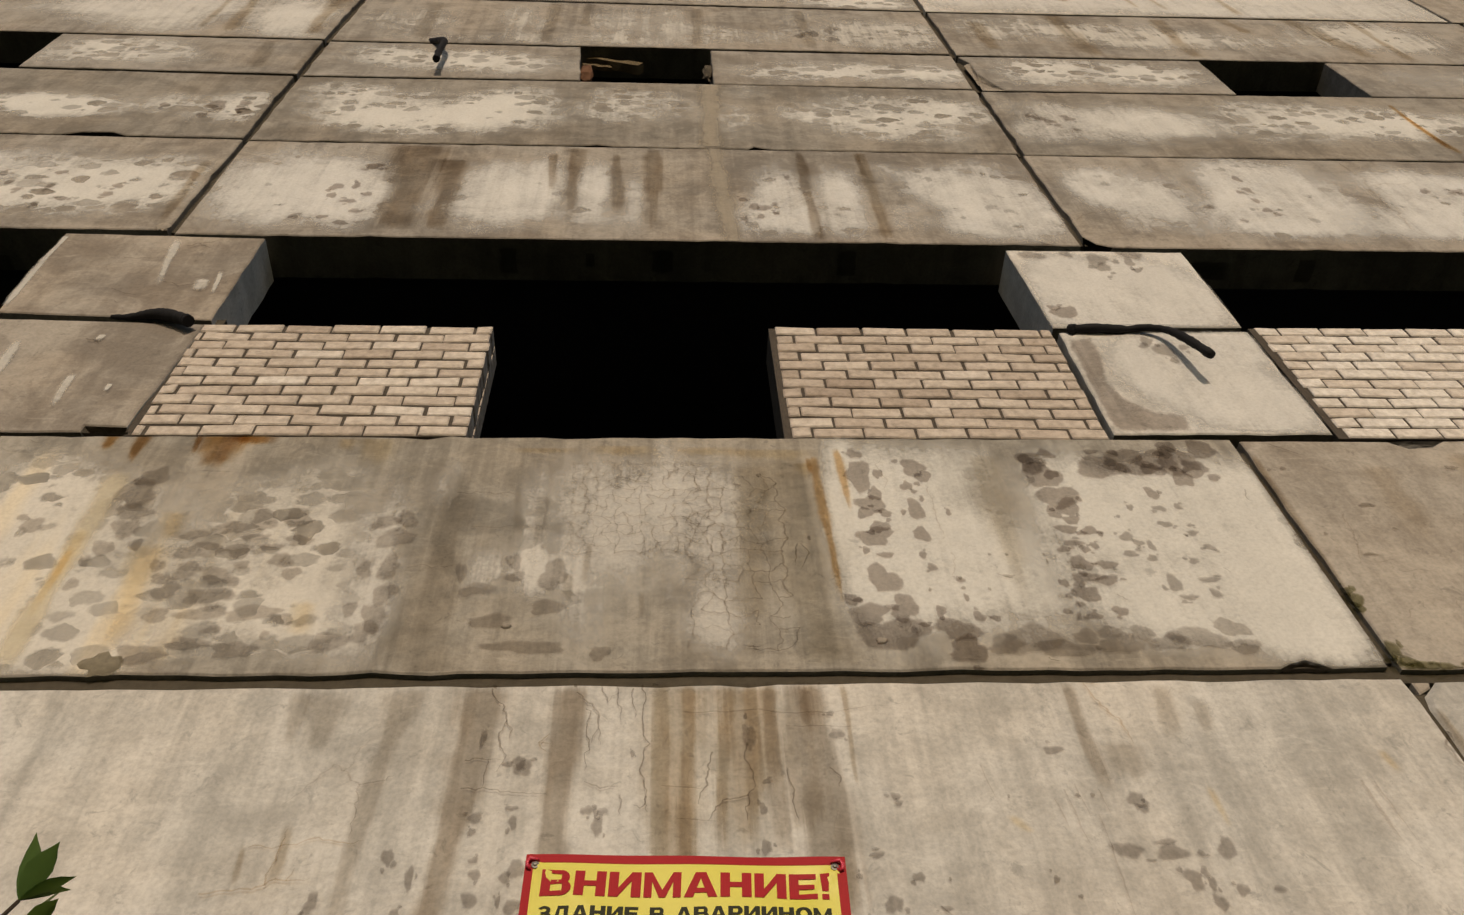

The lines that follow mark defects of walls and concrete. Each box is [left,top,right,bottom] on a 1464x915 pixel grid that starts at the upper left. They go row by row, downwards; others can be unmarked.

water stain [700,84,738,241]
rust [1,478,123,658]